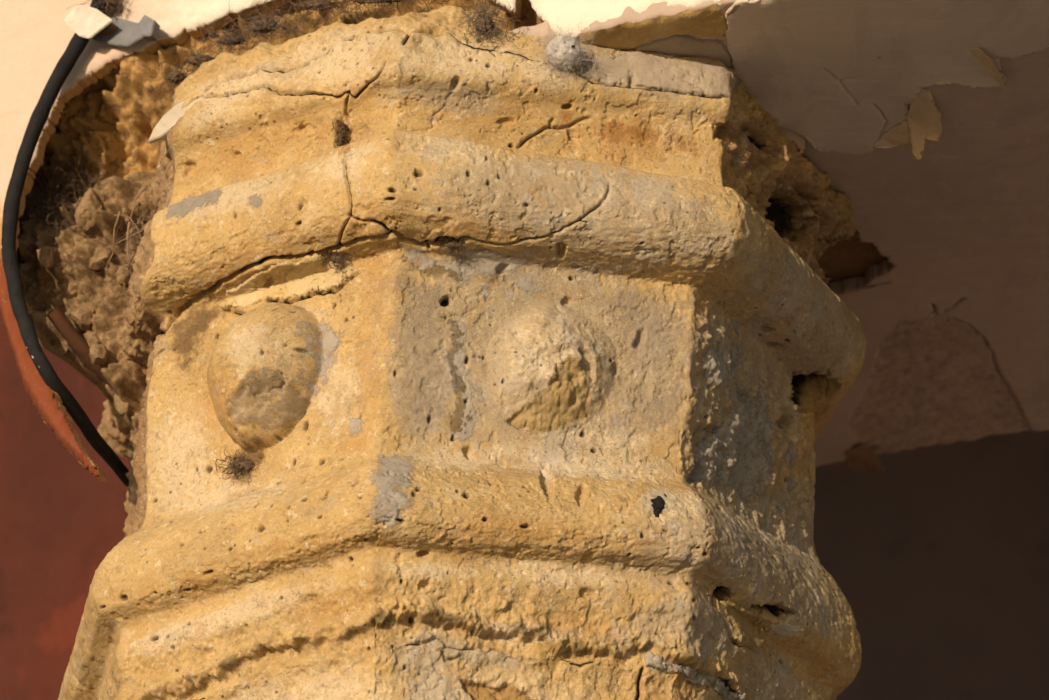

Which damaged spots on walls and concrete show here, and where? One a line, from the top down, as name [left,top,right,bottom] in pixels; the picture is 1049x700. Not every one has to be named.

crack [435,33,539,62]
crack [206,70,375,104]
crack [585,78,722,98]
peeling [577,0,1049,160]
peeling [148,97,205,144]
crack [214,165,467,286]
hole [765,198,794,240]
crack [270,274,359,304]